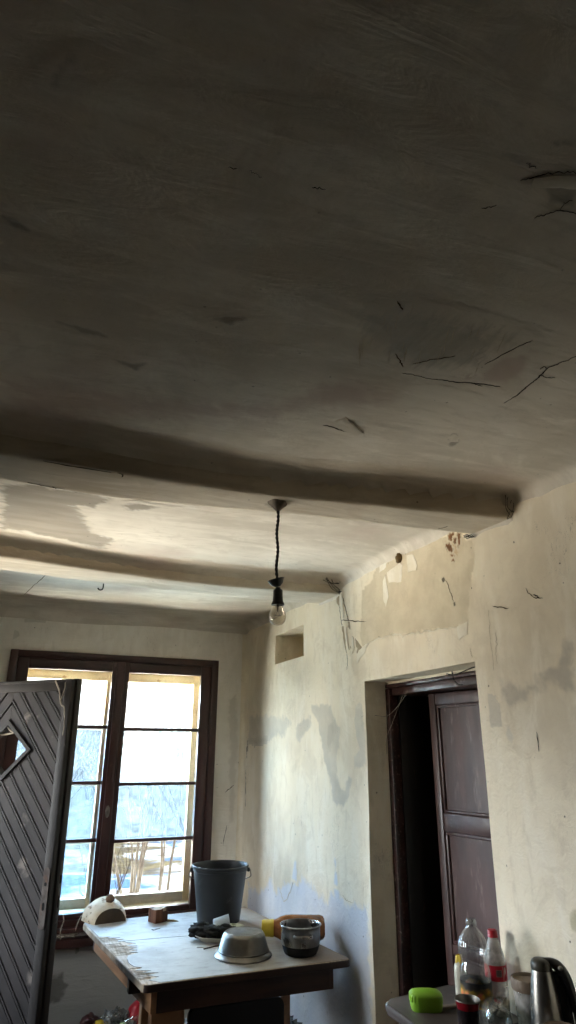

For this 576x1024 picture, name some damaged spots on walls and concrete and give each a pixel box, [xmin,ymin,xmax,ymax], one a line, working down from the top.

crack [520,163,576,181]
crack [535,200,576,218]
crack [402,340,576,402]
peeling [336,534,478,654]
crack [441,576,456,607]